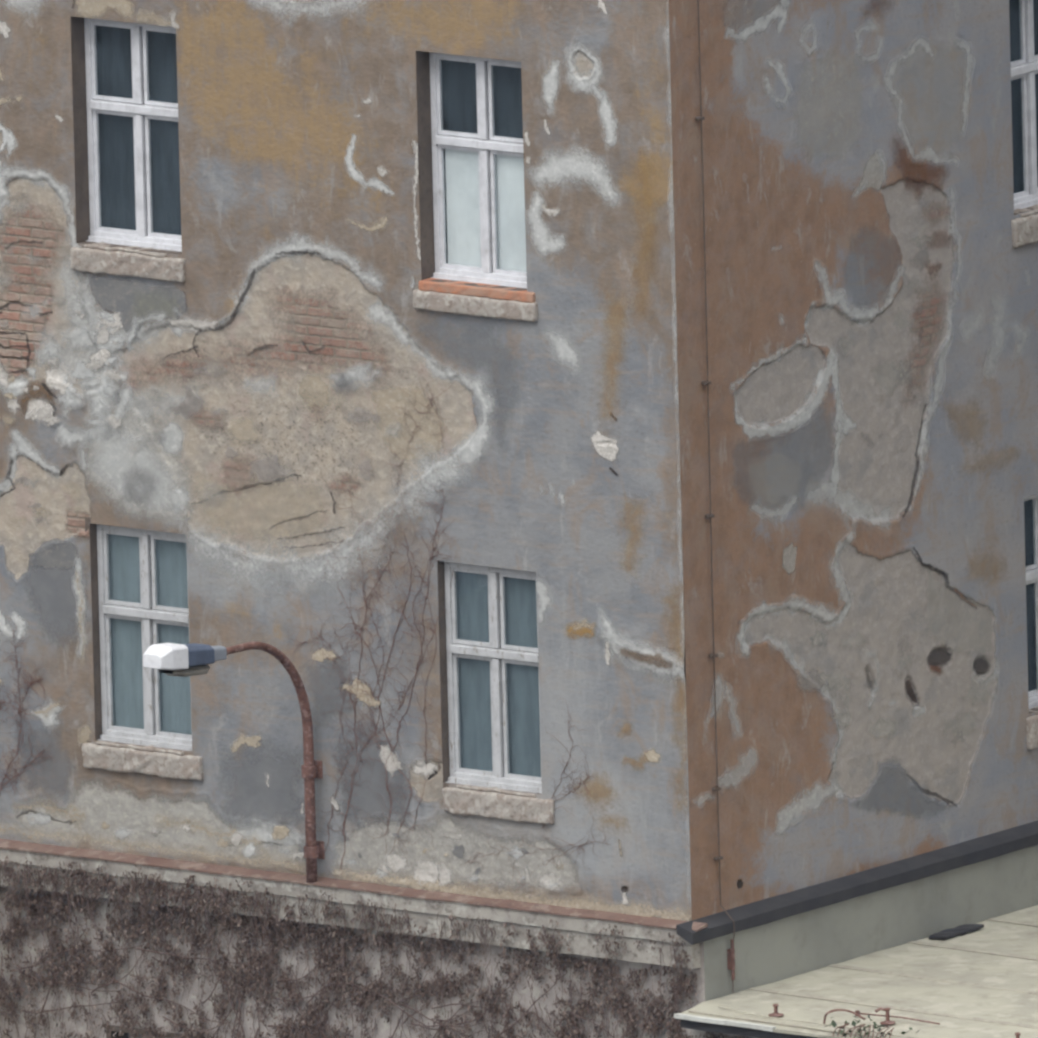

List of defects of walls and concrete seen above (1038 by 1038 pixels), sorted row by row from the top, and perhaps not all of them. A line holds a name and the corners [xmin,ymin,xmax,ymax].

spalling [567,45,602,92]
spalling [0,124,494,659]
spalling [591,431,619,476]
spalling [312,648,336,662]
spalling [343,677,381,707]
spalling [231,736,261,752]